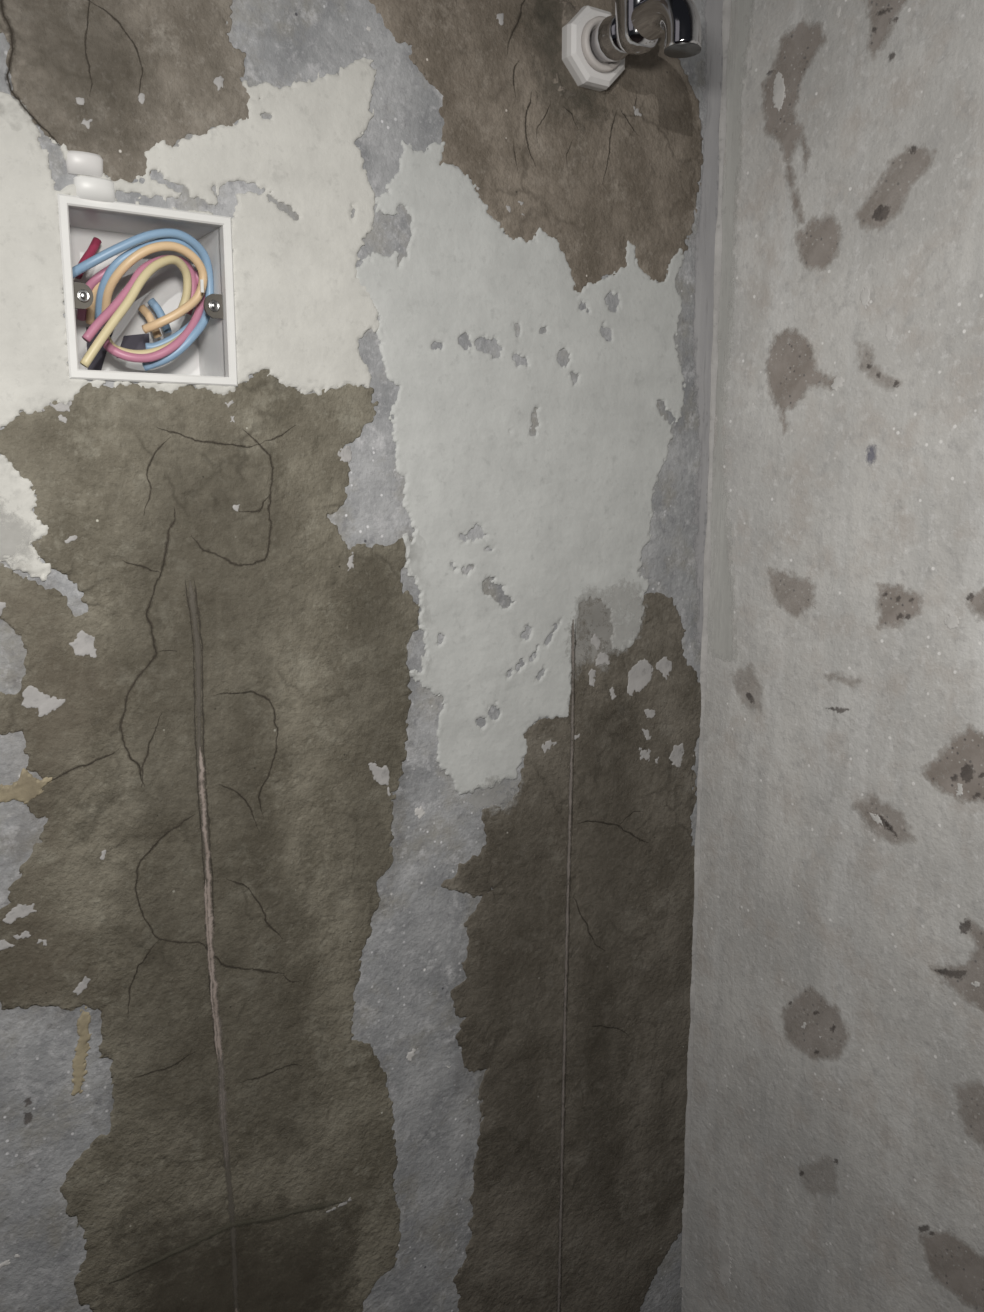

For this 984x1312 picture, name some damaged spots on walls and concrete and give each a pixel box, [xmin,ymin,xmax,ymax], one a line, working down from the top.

crack [0,0,60,146]
crack [85,0,143,99]
peeling [0,0,250,183]
water stain [763,23,839,268]
water stain [768,330,844,426]
water stain [927,729,984,800]
crack [47,426,301,1312]
peeling [0,369,420,1312]
peeling [441,592,701,1312]
water stain [785,990,846,1057]
water stain [139,1224,344,1312]